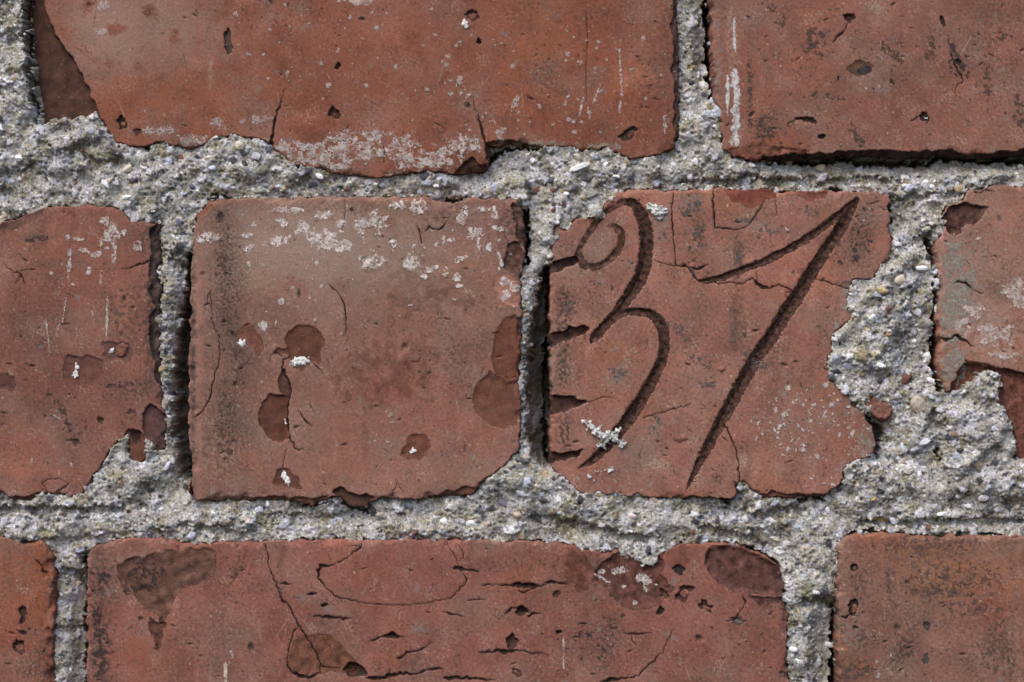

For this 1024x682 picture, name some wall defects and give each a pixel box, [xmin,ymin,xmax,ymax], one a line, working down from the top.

spalling [28,0,142,136]
damp [275,124,481,176]
damp [197,221,226,243]
damp [241,199,520,301]
crack [655,191,848,302]
spalling [941,202,989,236]
spalling [236,323,325,443]
spalling [950,363,1024,458]
crack [265,544,340,678]
crack [317,543,467,606]
crack [602,631,672,682]
spalling [704,545,786,608]